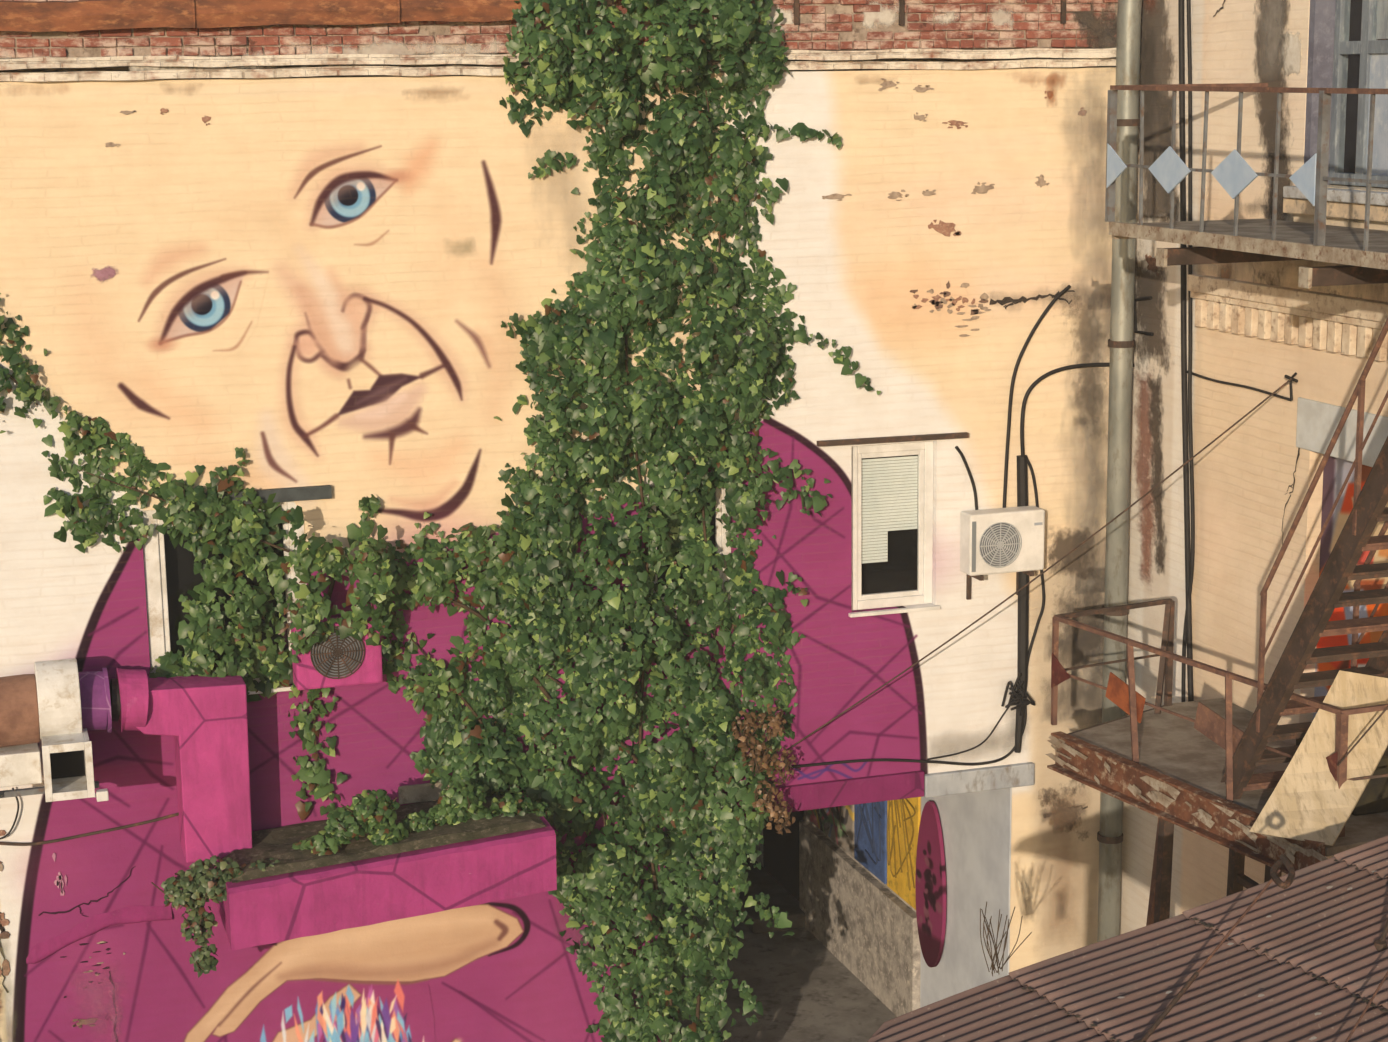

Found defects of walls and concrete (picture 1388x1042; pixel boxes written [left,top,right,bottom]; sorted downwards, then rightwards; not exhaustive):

spalling [878,78,934,92]
spalling [914,112,968,129]
water stain [1255,0,1291,221]
spalling [971,182,995,194]
spalling [928,220,961,237]
peeling [910,281,991,337]
water stain [1134,256,1169,370]
water stain [1049,306,1102,726]
water stain [1042,789,1087,834]
peeling [1127,775,1328,864]
spalling [0,913,10,939]
crack [98,971,118,1042]